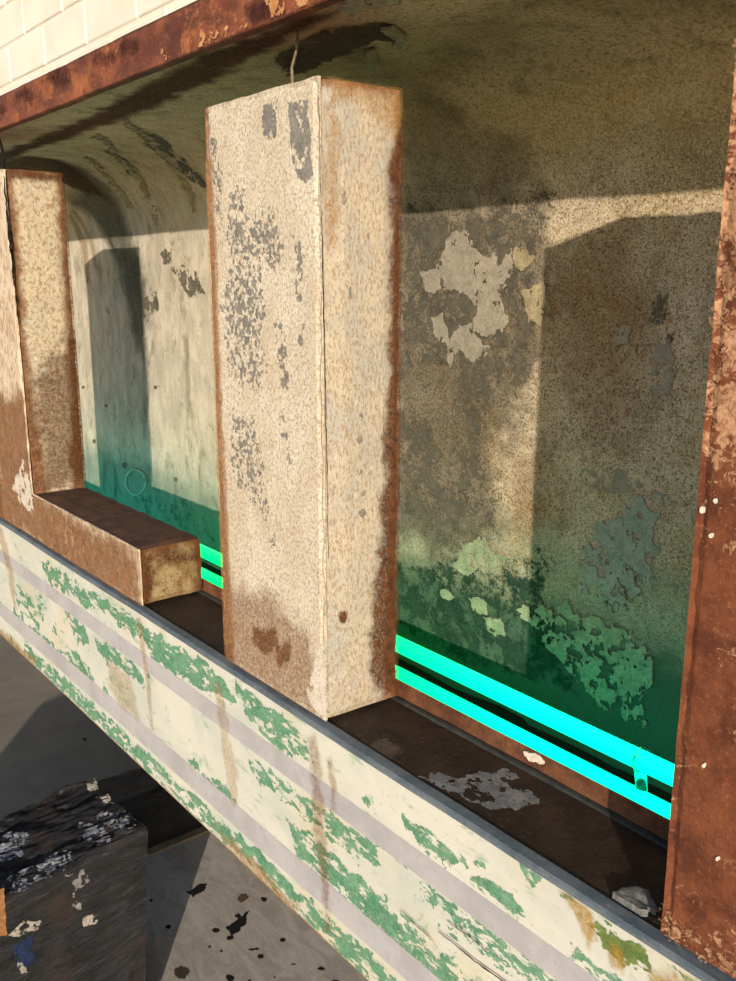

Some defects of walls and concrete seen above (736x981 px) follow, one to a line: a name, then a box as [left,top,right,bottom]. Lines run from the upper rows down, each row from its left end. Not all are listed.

rust [245,1,270,26]
peeling [265,0,308,18]
peeling [262,99,313,184]
peeling [274,24,403,77]
peeling [12,459,34,514]
rust [0,15,330,606]
peeling [123,118,305,393]
peeling [229,408,269,521]
rust [205,161,311,697]
rust [369,127,403,693]
peeling [395,181,665,732]
peeling [248,759,557,981]